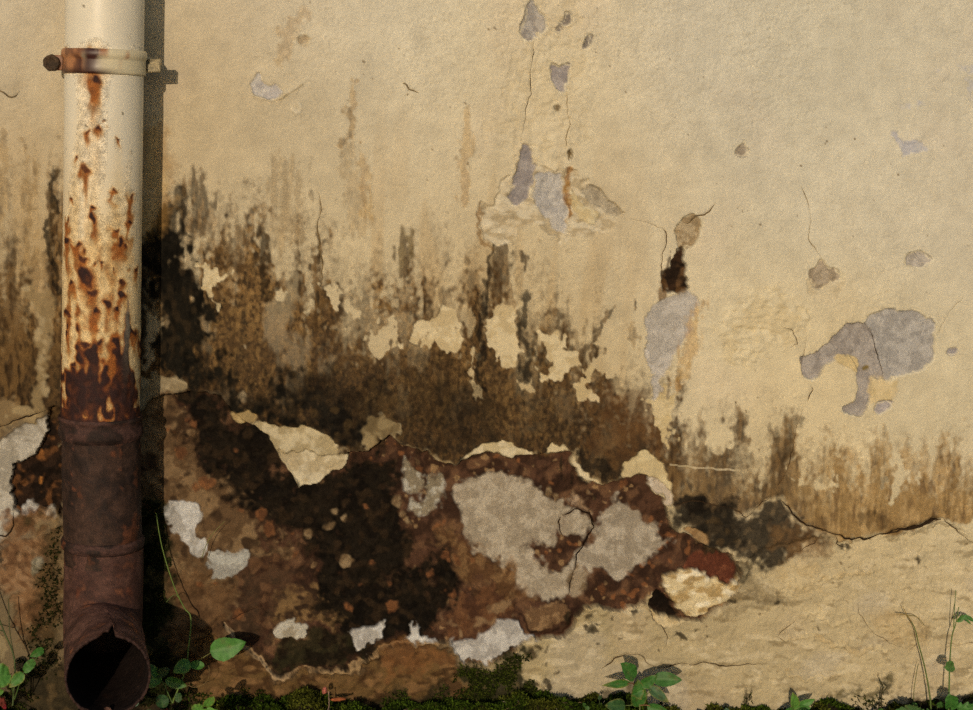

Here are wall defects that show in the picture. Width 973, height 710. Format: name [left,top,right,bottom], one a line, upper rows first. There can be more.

corrosion [64,37,112,49]
flaking render [474,0,627,253]
water stain [0,122,64,451]
corrosion [60,73,142,422]
peeling [483,298,526,370]
water stain [140,76,973,624]
peeling [534,329,600,404]
flaking render [140,371,734,706]
crack [558,508,594,595]
crack [677,388,969,560]
water stain [0,655,80,710]
water stain [522,643,640,699]